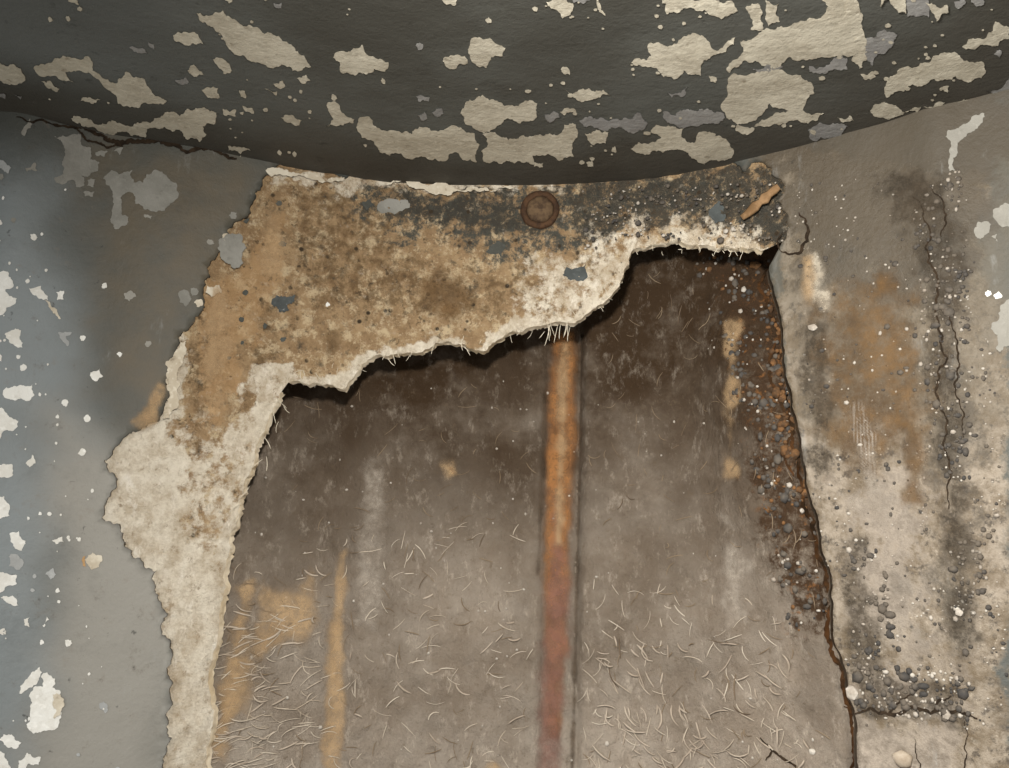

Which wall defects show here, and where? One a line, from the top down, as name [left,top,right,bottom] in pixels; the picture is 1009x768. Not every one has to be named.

crack [16,116,237,160]
peeling [0,56,254,229]
peeling [870,21,1009,119]
water stain [805,254,829,309]
water stain [888,174,967,320]
spalling [102,0,897,768]
water stain [800,329,833,424]
peeling [20,667,65,734]
rust [321,576,346,768]
rust [543,333,576,768]
crack [757,188,977,768]
water stain [844,538,964,723]